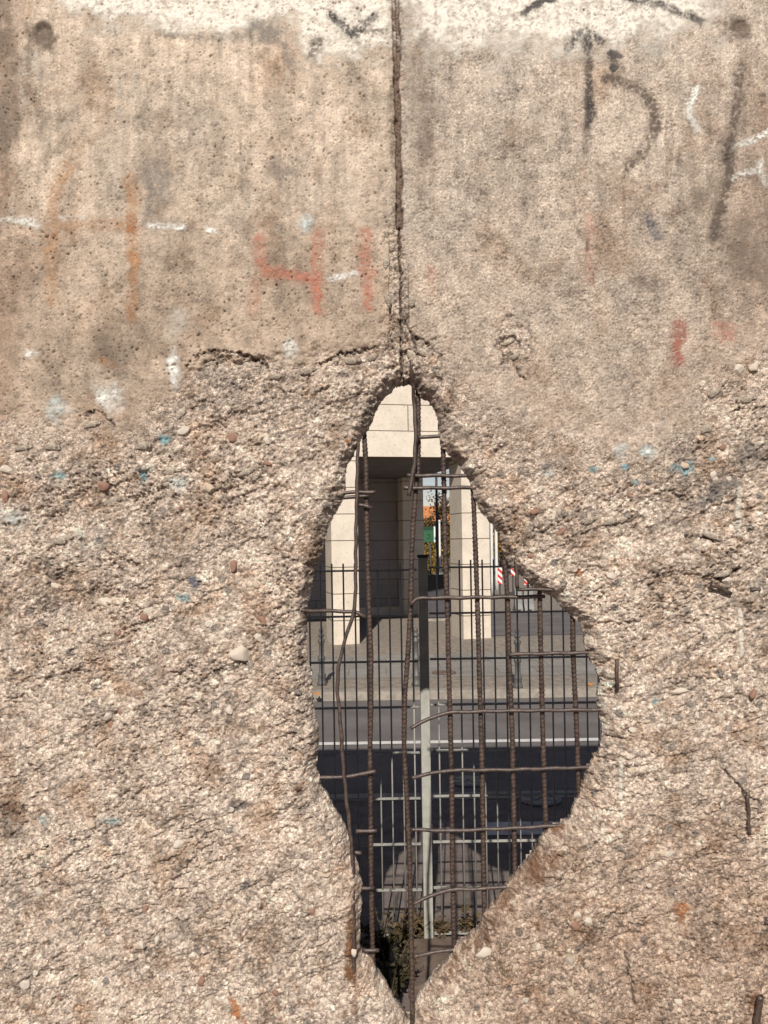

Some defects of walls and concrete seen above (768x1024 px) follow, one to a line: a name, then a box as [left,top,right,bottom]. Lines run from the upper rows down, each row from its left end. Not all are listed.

rust [345,920,356,989]
spalling [0,234,768,1024]